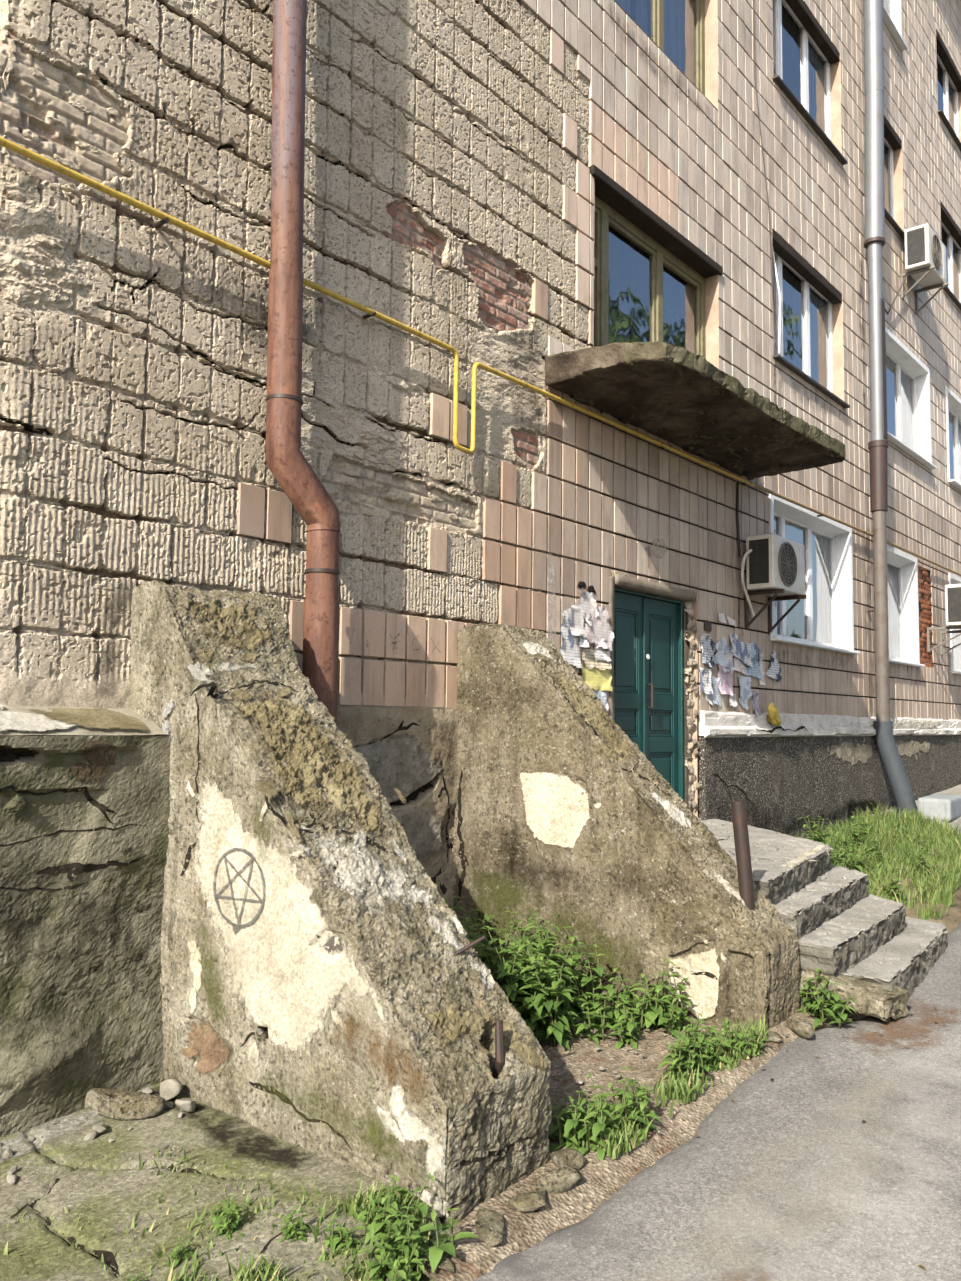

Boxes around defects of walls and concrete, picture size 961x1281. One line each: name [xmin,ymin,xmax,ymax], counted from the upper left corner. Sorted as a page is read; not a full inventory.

spalling [0,35,129,314]
spalling [386,195,533,333]
crack [92,262,267,430]
crack [103,458,236,490]
crack [301,386,463,490]
spalling [914,566,933,668]
crack [0,785,146,891]
crack [180,680,308,876]
spalling [356,735,443,806]
flaking render [520,772,601,848]
flaking render [182,780,496,1073]
crack [249,1081,352,1151]